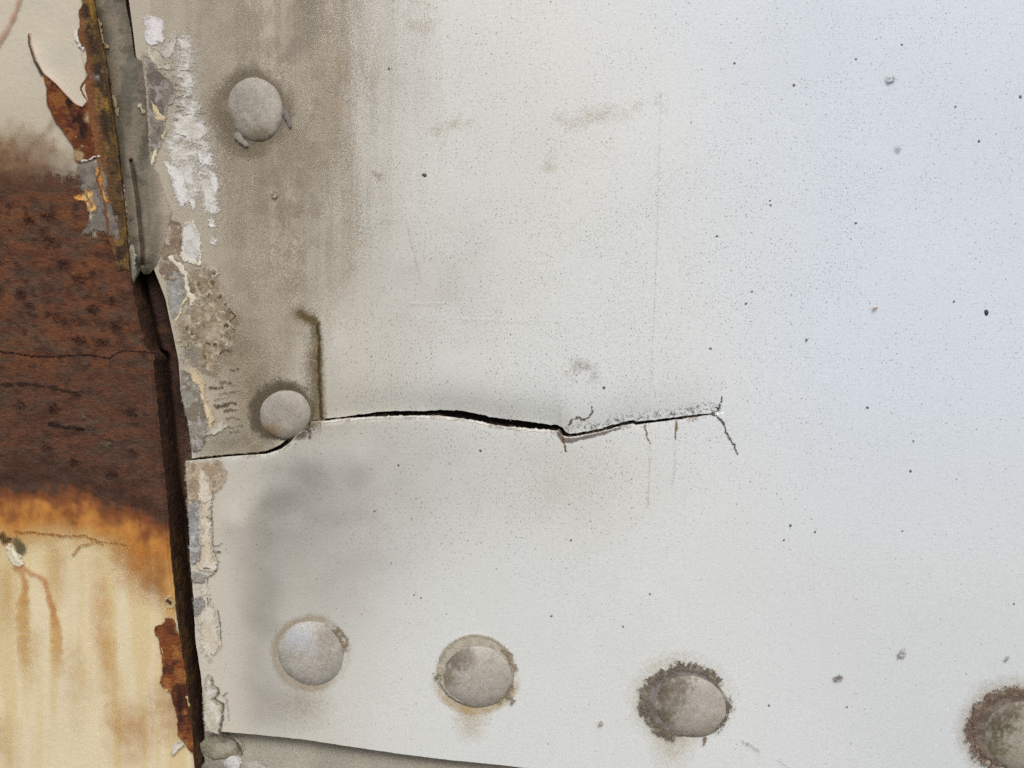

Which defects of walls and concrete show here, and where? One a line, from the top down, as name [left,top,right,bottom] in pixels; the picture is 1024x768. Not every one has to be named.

rust [0,137,194,756]
peeling [138,16,242,661]
peeling [202,674,229,738]
crack [260,309,738,455]